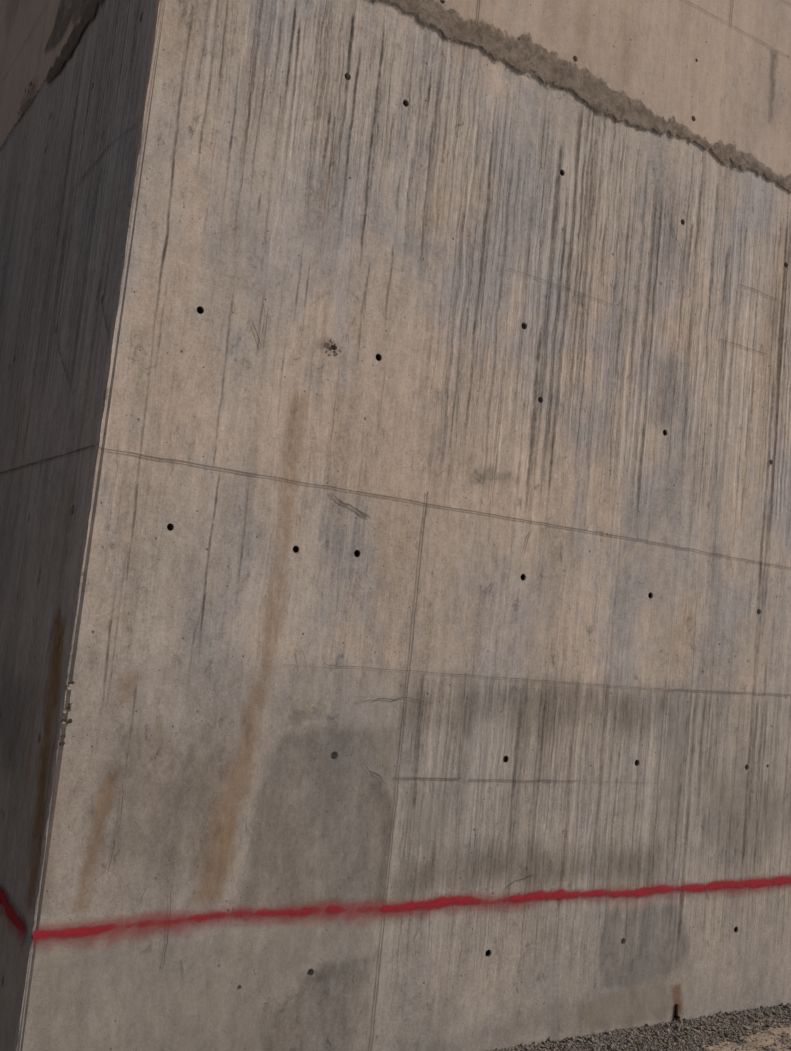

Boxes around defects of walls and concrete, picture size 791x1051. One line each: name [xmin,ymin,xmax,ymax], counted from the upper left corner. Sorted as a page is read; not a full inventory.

leakage [46,0,87,50]